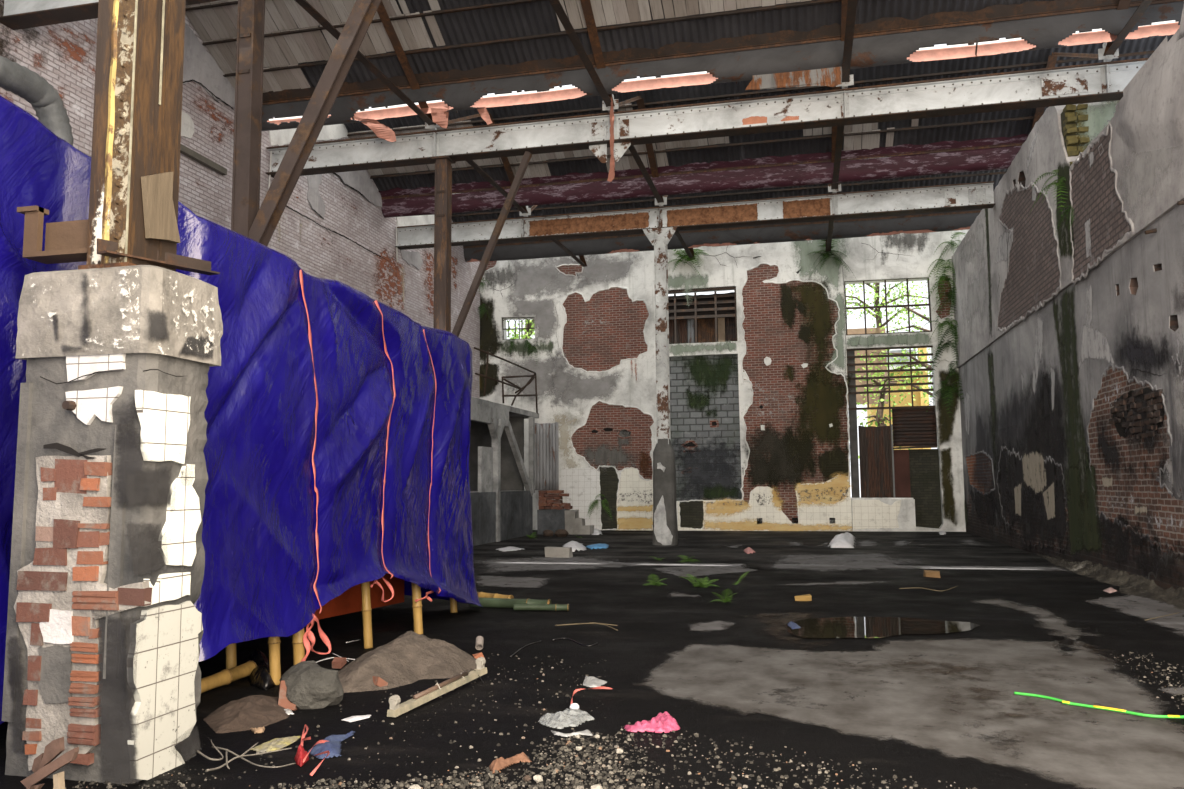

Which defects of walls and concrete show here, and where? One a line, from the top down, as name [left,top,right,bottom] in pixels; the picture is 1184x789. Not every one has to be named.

spalling [14,455,152,789]
flaking render [556,264,583,277]
flaking render [561,263,850,545]
leakage [795,299,811,344]
leakage [816,443,851,481]
flaking render [997,104,1135,333]
leakage [1021,285,1184,553]
flaking render [1085,364,1184,633]